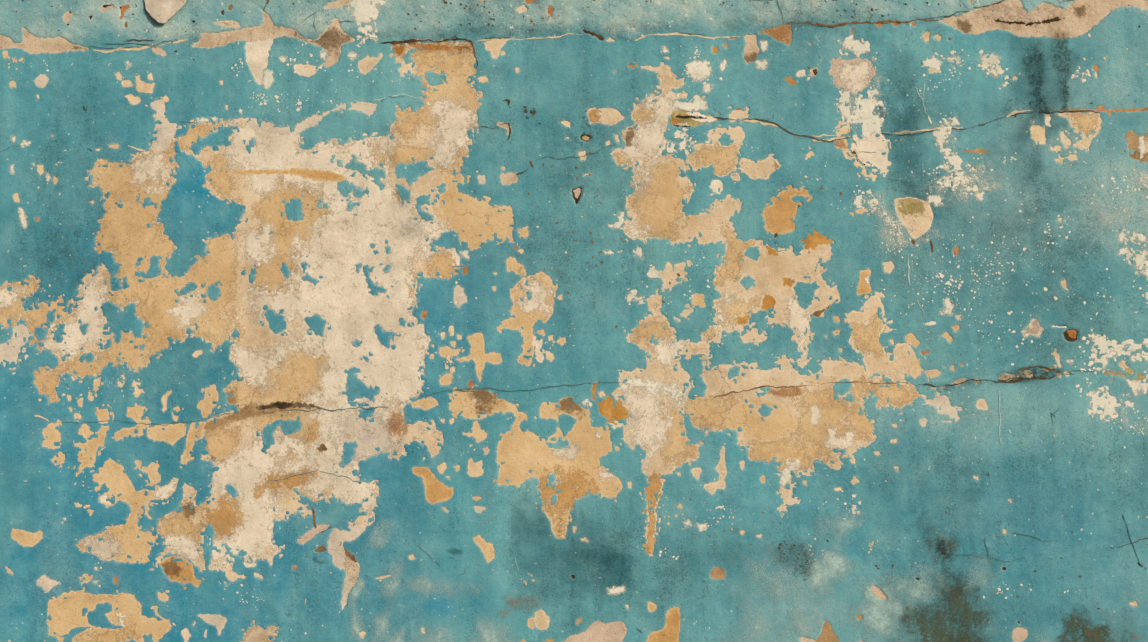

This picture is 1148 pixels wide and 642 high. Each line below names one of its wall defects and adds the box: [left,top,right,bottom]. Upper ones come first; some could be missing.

crack [94,39,188,53]
crack [382,29,581,68]
spalling [743,24,792,70]
spalling [876,0,1148,96]
damp [1027,34,1071,114]
crack [715,108,1100,154]
peeling [0,38,966,642]
crack [687,365,1095,398]
peeling [998,312,1148,429]
damp [779,516,859,593]
damp [855,575,994,642]
damp [1060,613,1114,642]